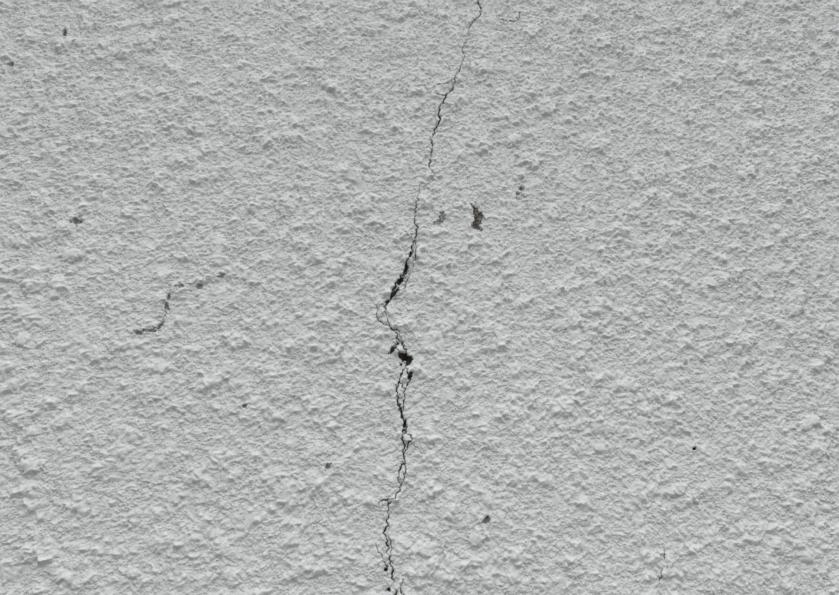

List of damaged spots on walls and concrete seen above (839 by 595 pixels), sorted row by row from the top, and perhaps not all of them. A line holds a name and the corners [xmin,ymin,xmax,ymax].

crack [376,0,482,595]